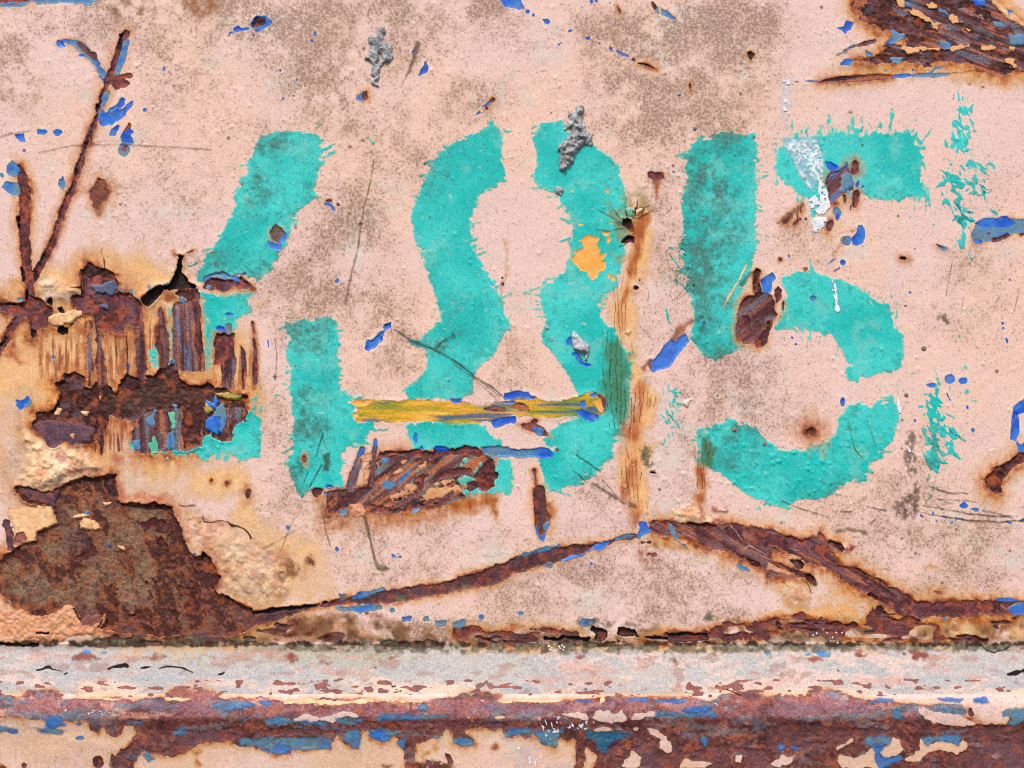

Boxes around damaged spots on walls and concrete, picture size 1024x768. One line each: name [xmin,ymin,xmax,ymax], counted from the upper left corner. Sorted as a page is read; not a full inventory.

rust [815,0,1024,87]
rust [824,158,860,235]
peeling [16,396,31,410]
peeling [48,309,82,337]
spalling [141,248,257,307]
rust [0,29,445,663]
peeling [212,312,236,388]
rust [601,201,660,525]
rust [734,257,785,350]
spalling [247,467,1024,632]
rust [447,584,1024,663]
rust [0,678,1024,768]